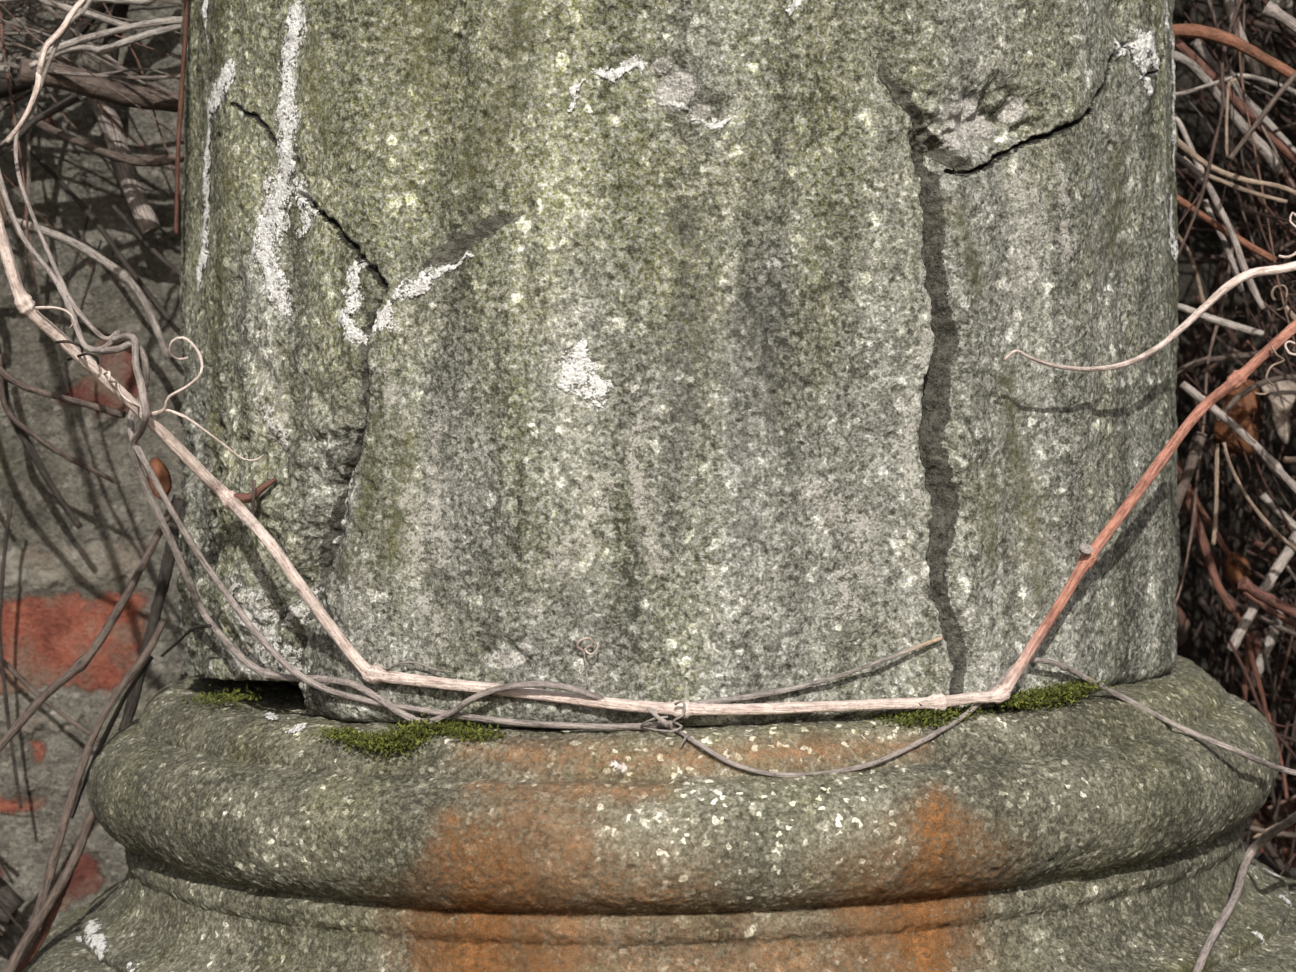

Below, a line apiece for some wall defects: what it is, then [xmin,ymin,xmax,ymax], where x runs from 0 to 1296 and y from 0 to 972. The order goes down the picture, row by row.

crack [230,102,279,144]
crack [418,215,514,273]
crack [298,197,389,672]
crack [878,18,1166,708]
rust [896,791,969,972]